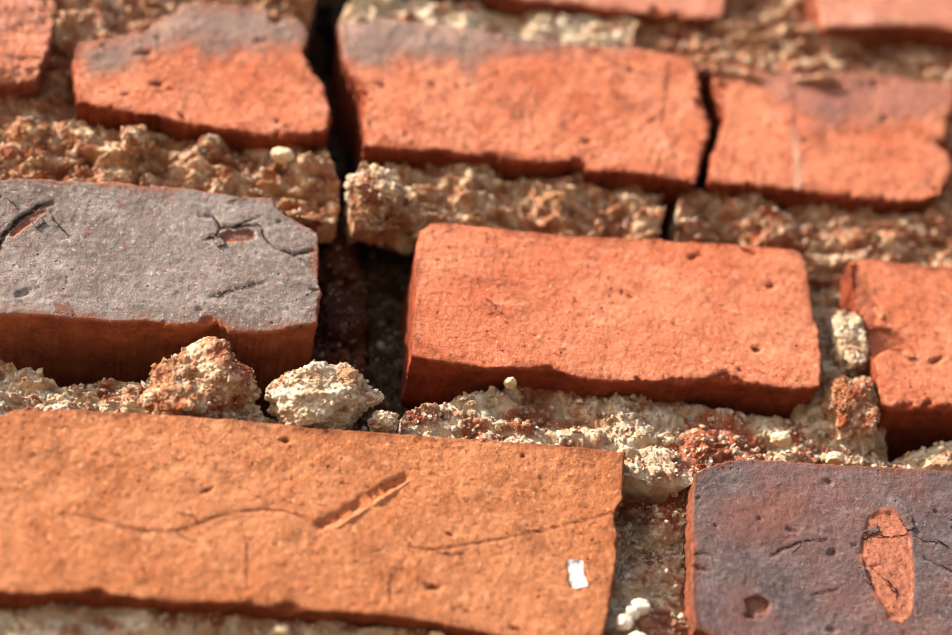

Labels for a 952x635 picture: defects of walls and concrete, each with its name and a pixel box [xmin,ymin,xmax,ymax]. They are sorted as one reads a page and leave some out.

crack [315,2,337,77]
crack [0,198,69,249]
crack [203,198,313,264]
crack [323,143,360,204]
crack [658,155,709,241]
crack [212,280,264,297]
crack [388,513,611,602]
crack [772,539,827,555]
spalling [858,507,915,623]
crack [916,537,952,572]